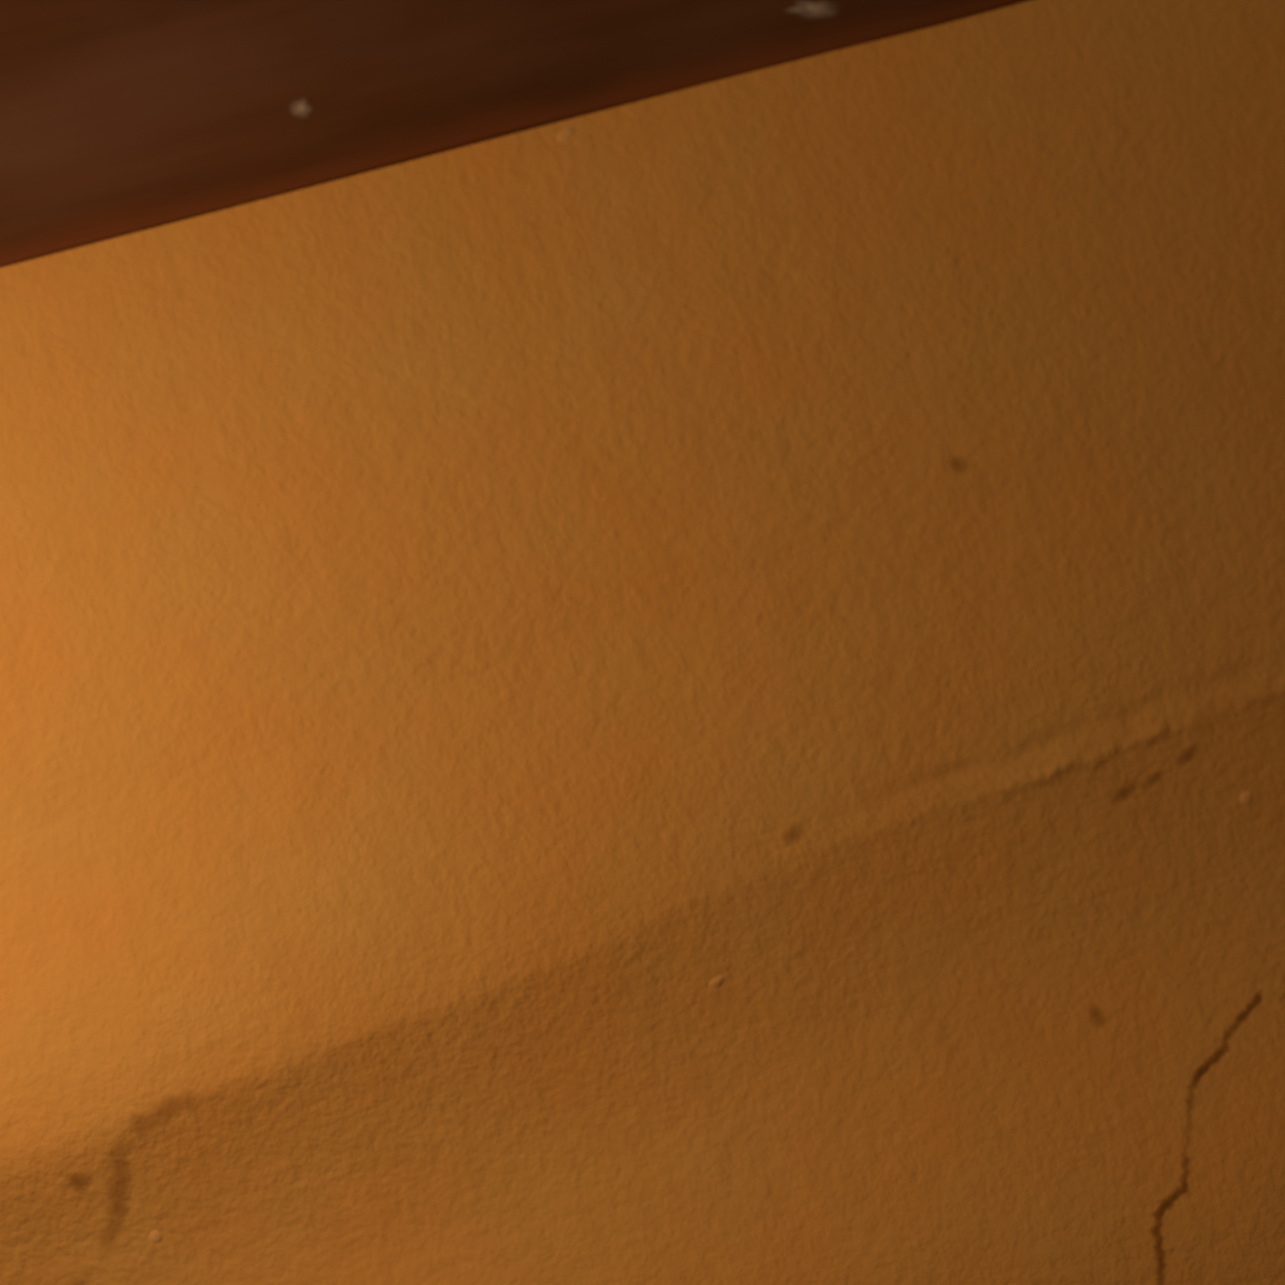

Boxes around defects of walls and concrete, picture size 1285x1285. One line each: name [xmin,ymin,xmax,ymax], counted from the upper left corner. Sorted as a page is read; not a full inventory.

crack [1193,994,1260,1083]
crack [1152,1160,1187,1274]